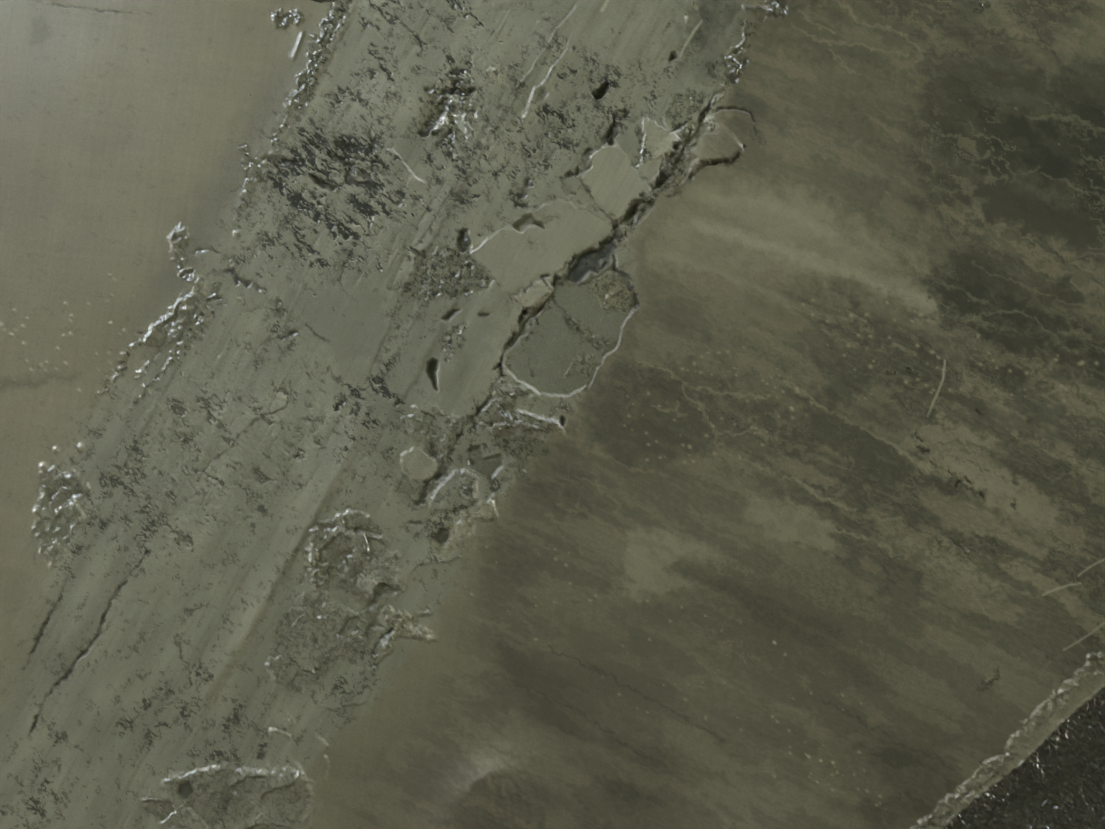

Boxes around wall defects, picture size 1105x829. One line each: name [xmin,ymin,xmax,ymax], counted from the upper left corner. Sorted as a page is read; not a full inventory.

crack [23,548,151,740]
spalling [28,0,792,829]
crack [415,105,766,510]
water stain [462,0,1105,778]